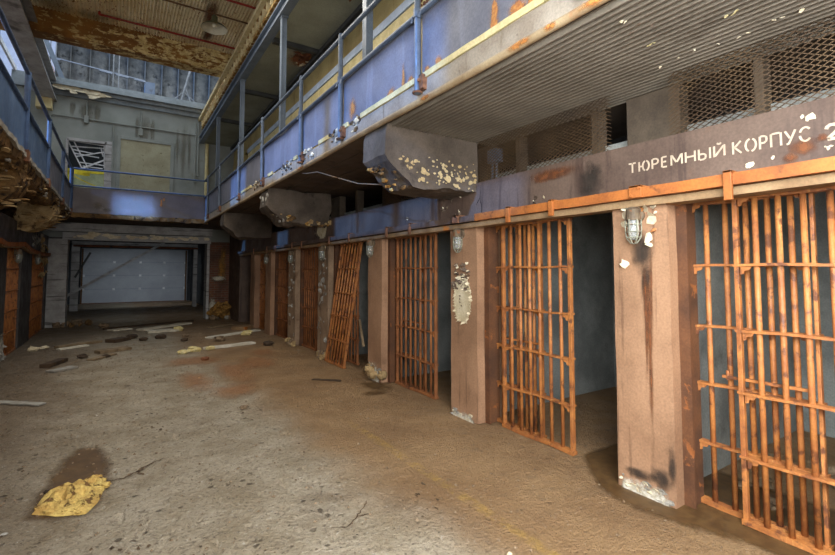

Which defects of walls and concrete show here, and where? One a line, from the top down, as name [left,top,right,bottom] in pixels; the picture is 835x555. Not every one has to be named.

rust [490,0,498,28]
rust [510,0,533,15]
spalling [367,165,406,192]
peeling [399,155,477,191]
peeling [305,219,331,304]
peeling [451,262,472,325]
rust [644,269,653,408]
damp [28,448,109,519]
damp [585,444,835,555]